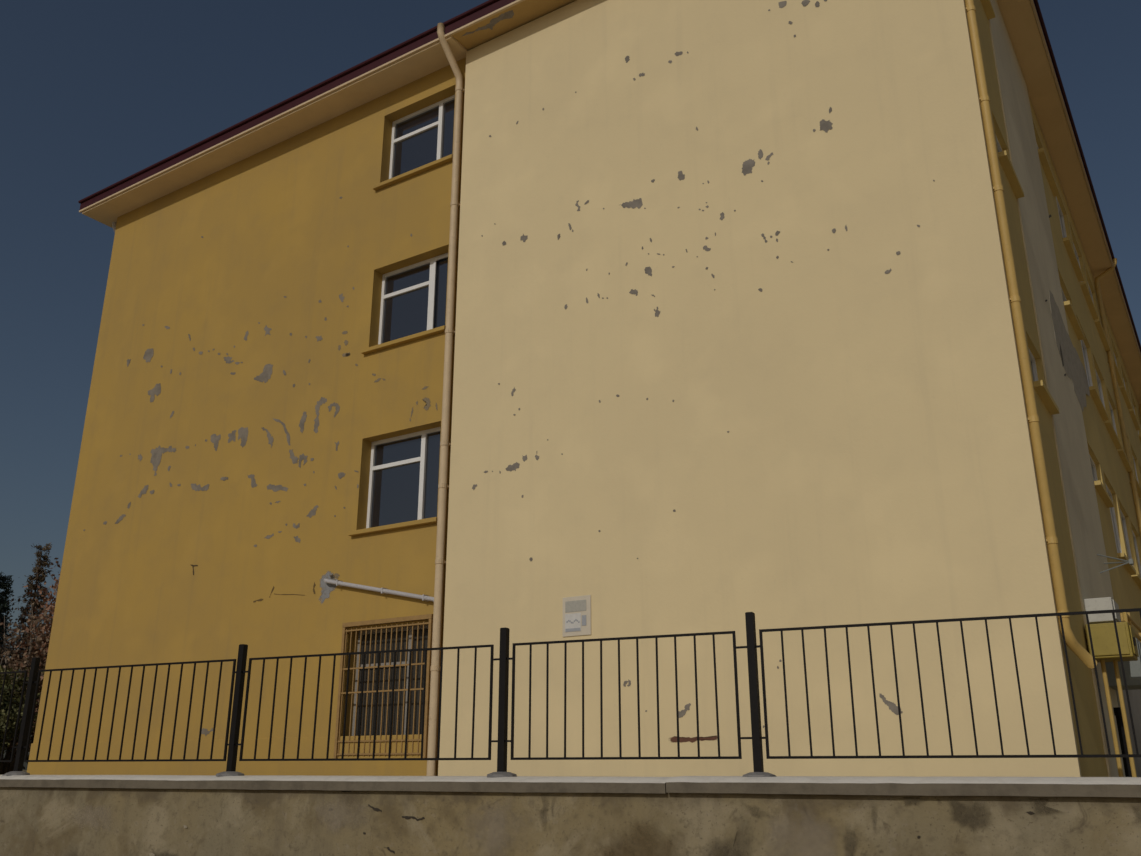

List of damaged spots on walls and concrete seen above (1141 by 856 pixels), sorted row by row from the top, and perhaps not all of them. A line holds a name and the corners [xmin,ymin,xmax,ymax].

peeling [813,107,833,133]
peeling [742,149,774,182]
peeling [621,198,646,209]
peeling [127,348,181,403]
peeling [254,364,295,387]
peeling [262,397,340,486]
peeling [103,427,248,525]
peeling [248,474,288,505]
peeling [879,693,903,715]